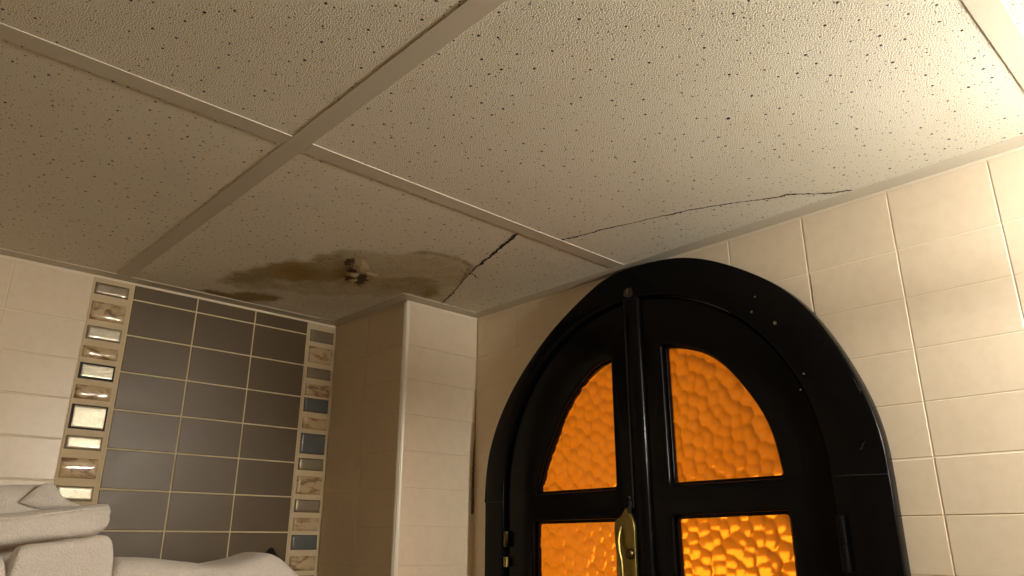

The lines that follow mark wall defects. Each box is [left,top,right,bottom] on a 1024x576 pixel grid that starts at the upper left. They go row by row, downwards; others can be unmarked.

crack [561,190,852,240]
water stain [204,256,347,301]
crack [442,234,519,303]